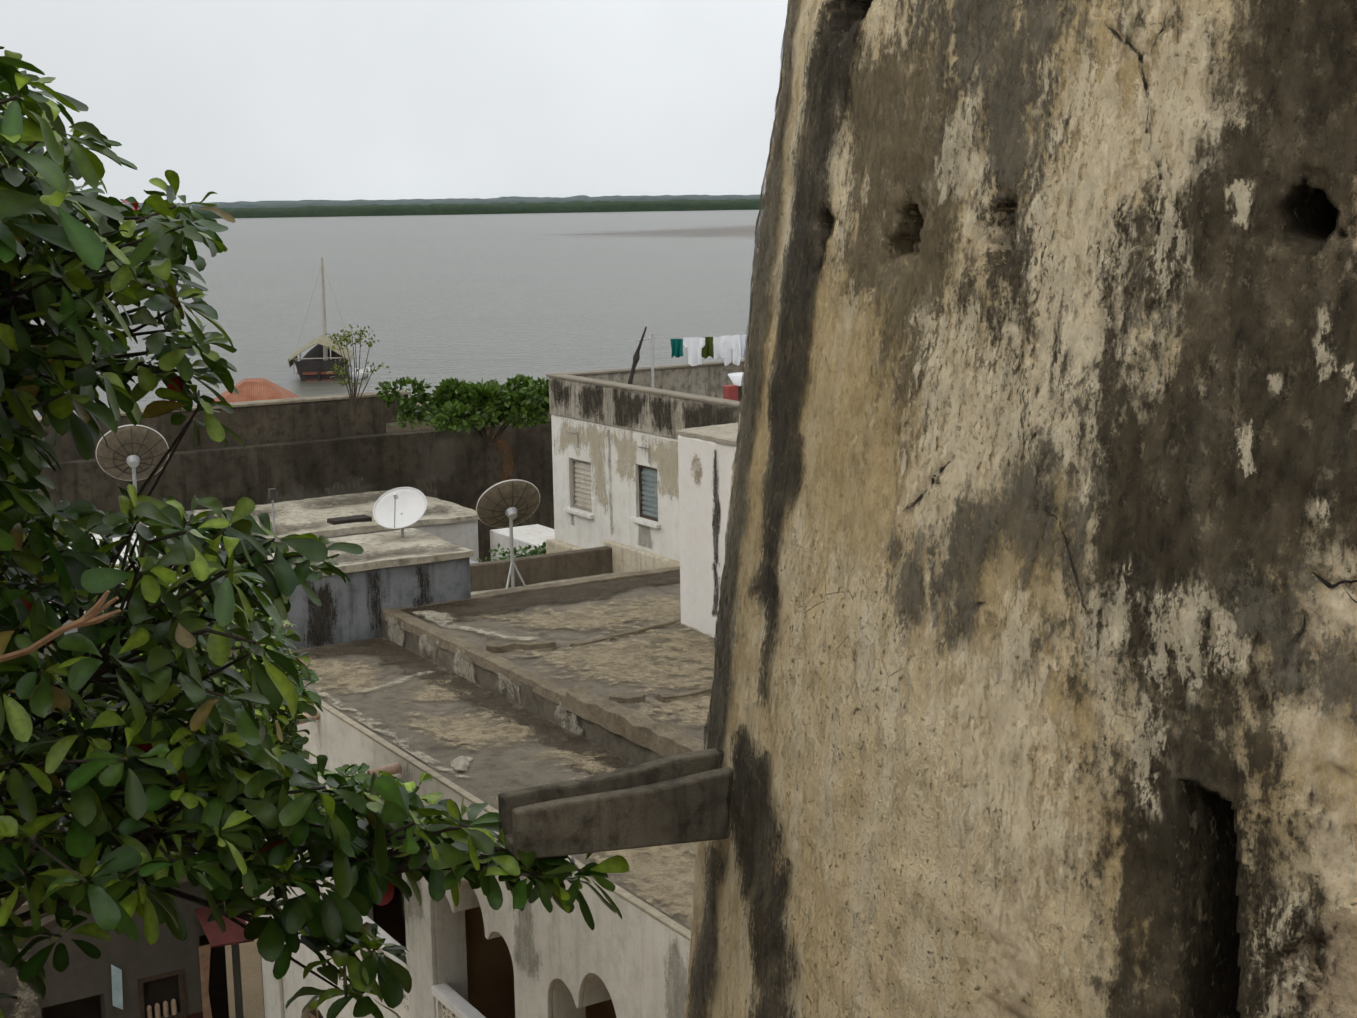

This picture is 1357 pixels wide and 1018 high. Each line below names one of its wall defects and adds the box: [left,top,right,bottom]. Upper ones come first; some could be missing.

damp [485,0,1357,1018]
damp [298,583,393,693]
damp [366,570,385,631]
damp [413,564,434,607]
peeling [1214,599,1254,667]
crack [1288,613,1306,662]
crack [1311,572,1357,603]
damp [402,680,615,780]
spalling [1269,576,1357,1018]